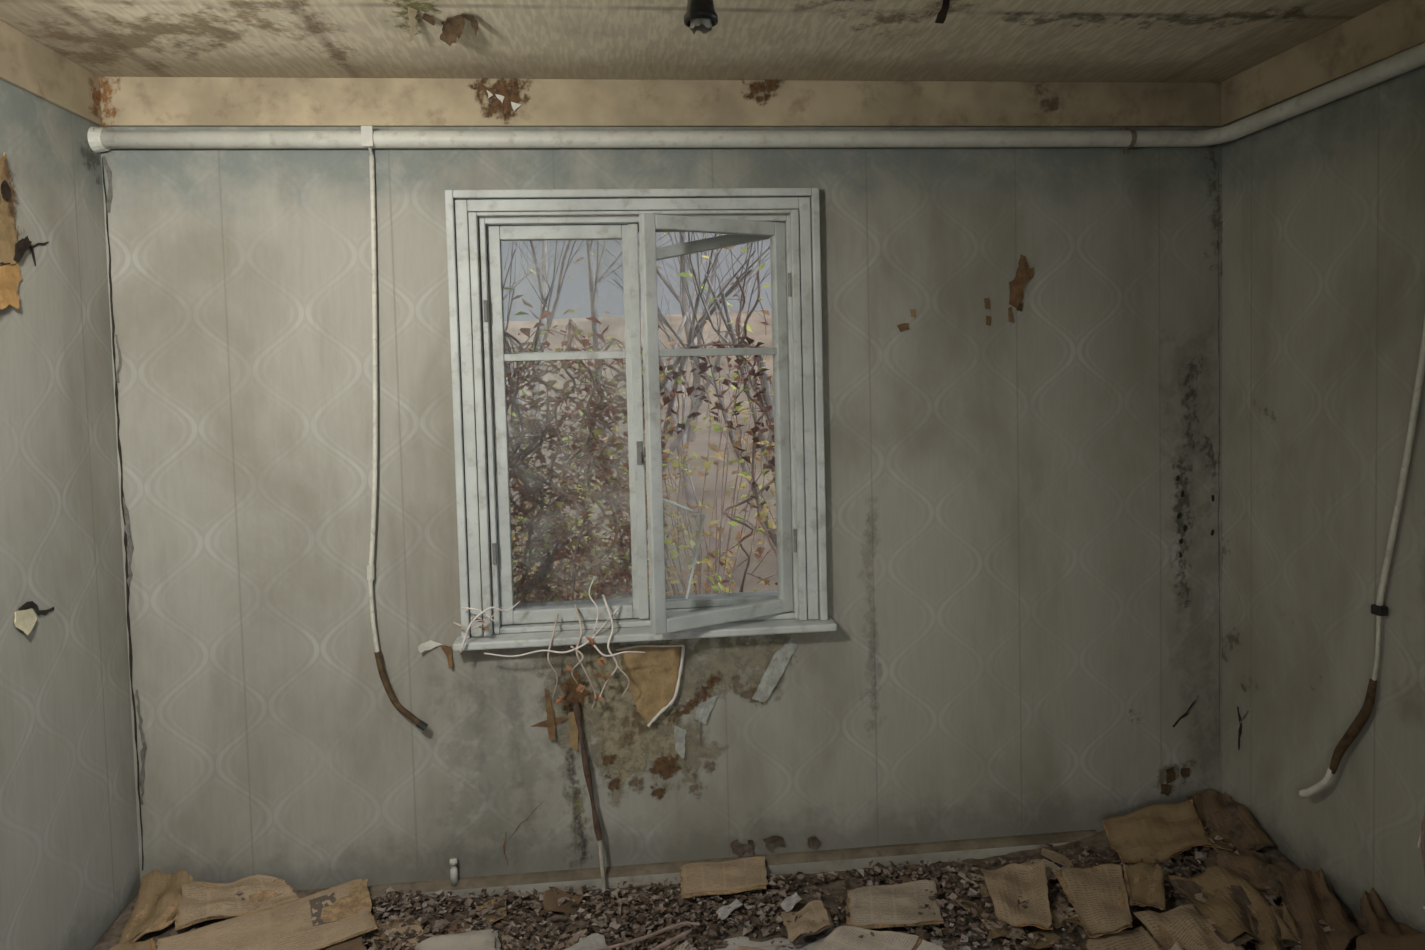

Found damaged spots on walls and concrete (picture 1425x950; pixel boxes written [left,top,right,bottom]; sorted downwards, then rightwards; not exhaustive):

water stain [47,1,324,63]
water stain [386,0,478,46]
water stain [470,78,530,124]
water stain [742,80,781,105]
peeling [0,262,22,309]
water stain [1176,475,1187,558]
flaking render [537,634,797,804]